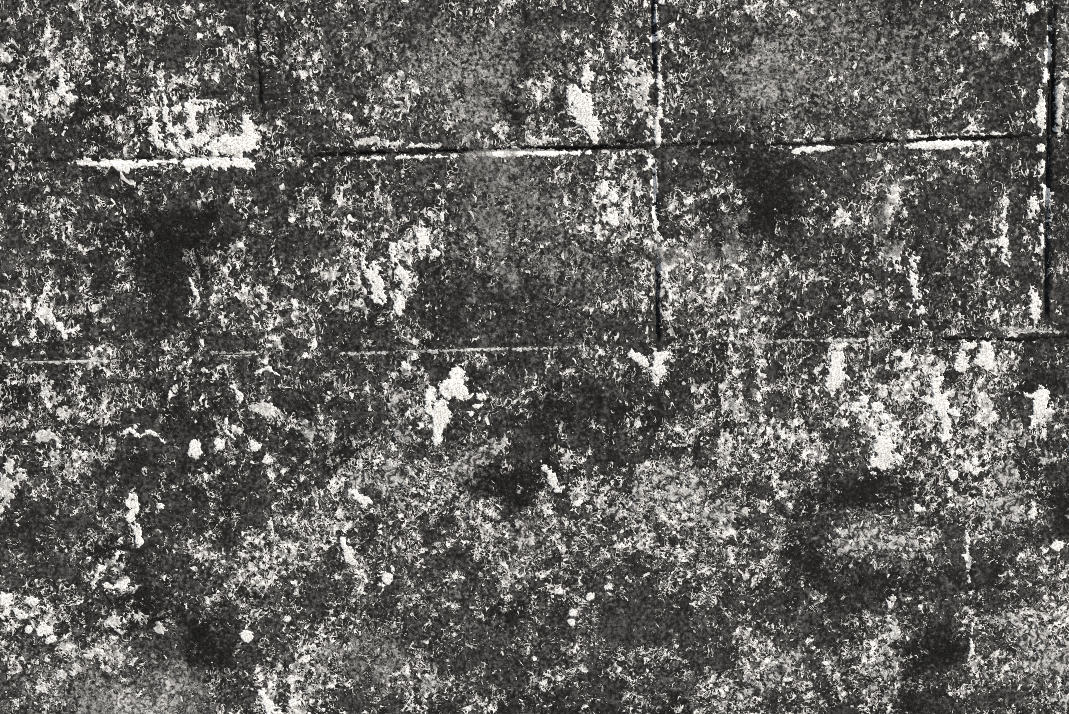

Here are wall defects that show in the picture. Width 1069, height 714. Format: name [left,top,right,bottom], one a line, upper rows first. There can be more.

leakage [127,193,239,288]